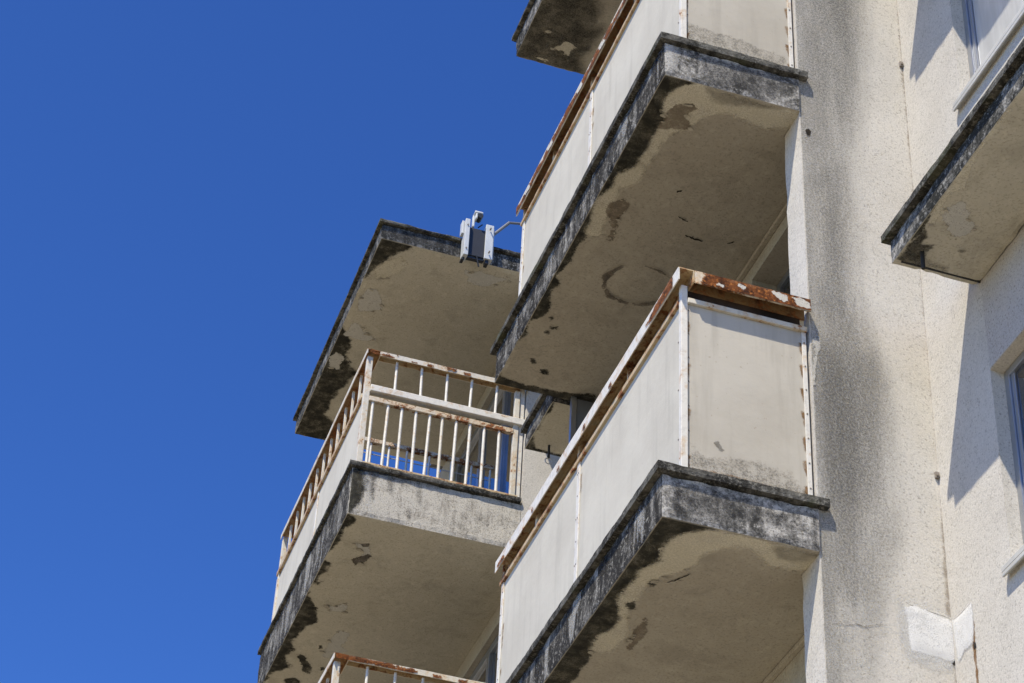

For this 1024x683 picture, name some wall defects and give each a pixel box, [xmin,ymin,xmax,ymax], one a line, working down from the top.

mould [516,0,602,74]
rust [516,0,625,214]
leakage [364,227,459,278]
leakage [519,45,693,340]
rust [701,274,811,311]
leakage [899,205,937,266]
leakage [295,327,356,440]
leakage [496,375,596,414]
leakage [261,468,420,683]
leakage [517,477,785,683]